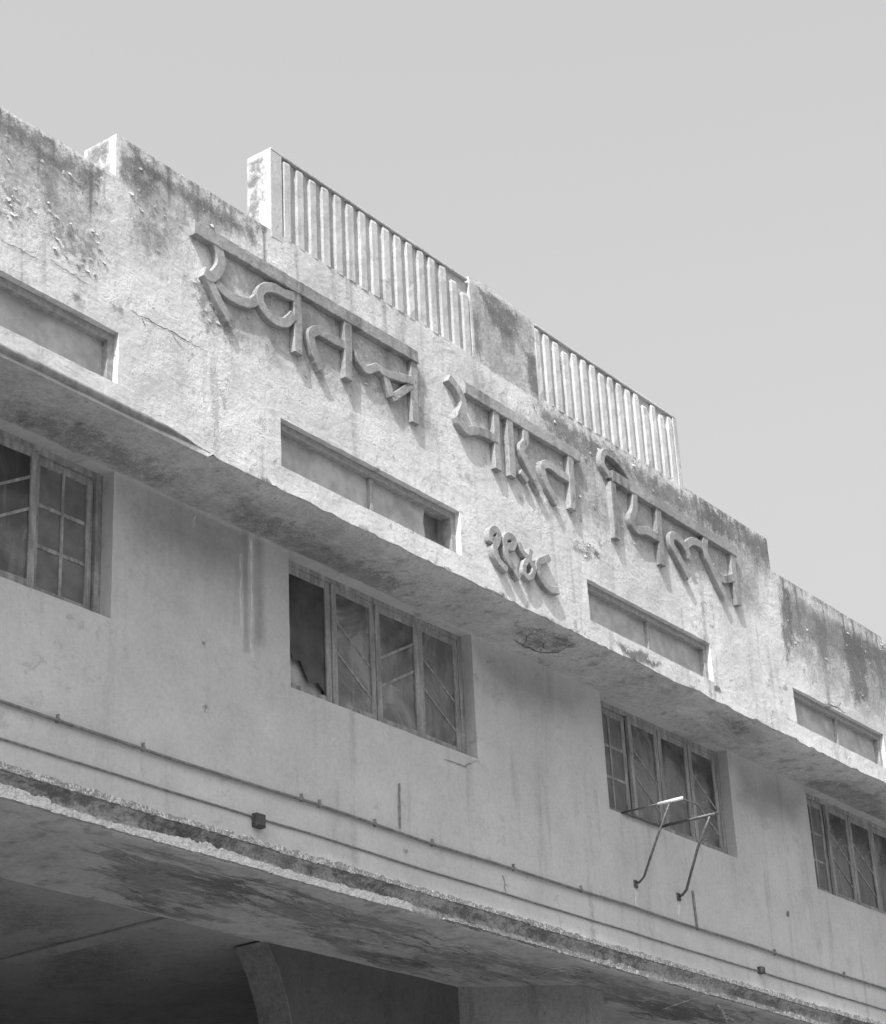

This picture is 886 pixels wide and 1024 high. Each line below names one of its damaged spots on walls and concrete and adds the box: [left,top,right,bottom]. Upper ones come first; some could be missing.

water stain [0,114,102,189]
water stain [119,142,268,246]
crack [133,311,207,352]
water stain [478,289,517,336]
water stain [0,342,210,453]
water stain [775,573,886,704]
flaking render [0,760,886,1024]